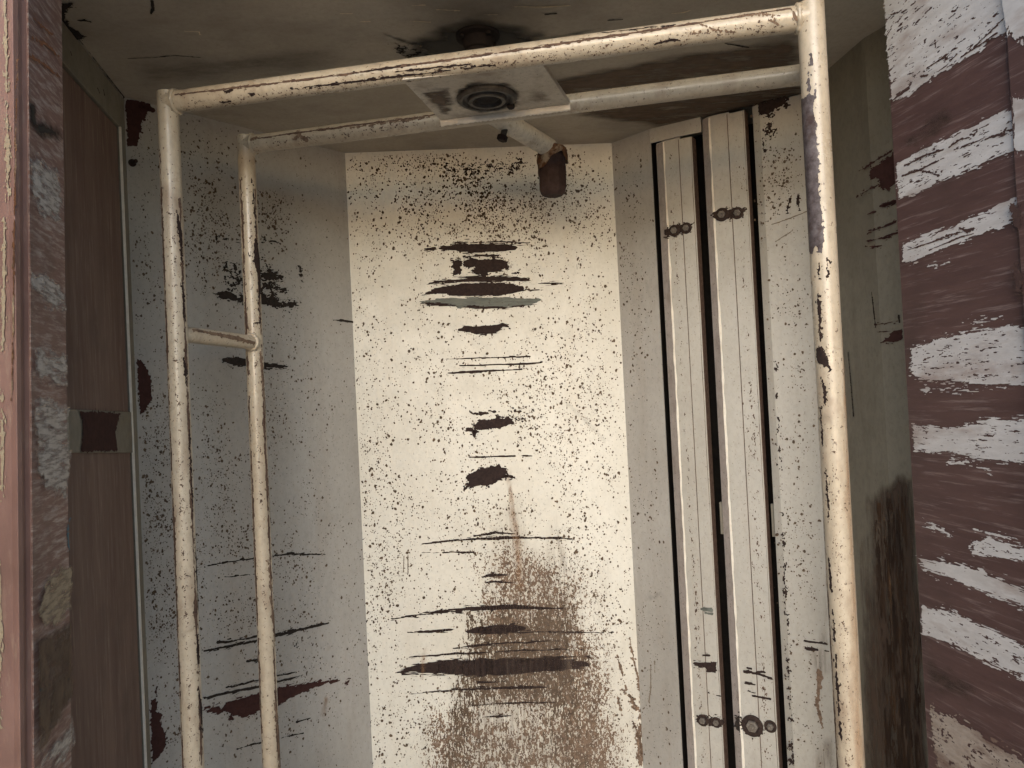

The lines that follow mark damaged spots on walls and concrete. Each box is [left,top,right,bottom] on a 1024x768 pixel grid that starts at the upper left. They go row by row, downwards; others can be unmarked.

peeling [883,0,1024,101]
peeling [856,96,1024,209]
peeling [213,178,303,325]
peeling [450,251,521,279]
peeling [902,197,1017,269]
peeling [874,315,1024,395]
rust [178,120,676,768]
peeling [461,464,516,493]
peeling [464,406,534,437]
peeling [149,686,168,764]
peeling [197,688,260,732]
peeling [274,677,351,768]